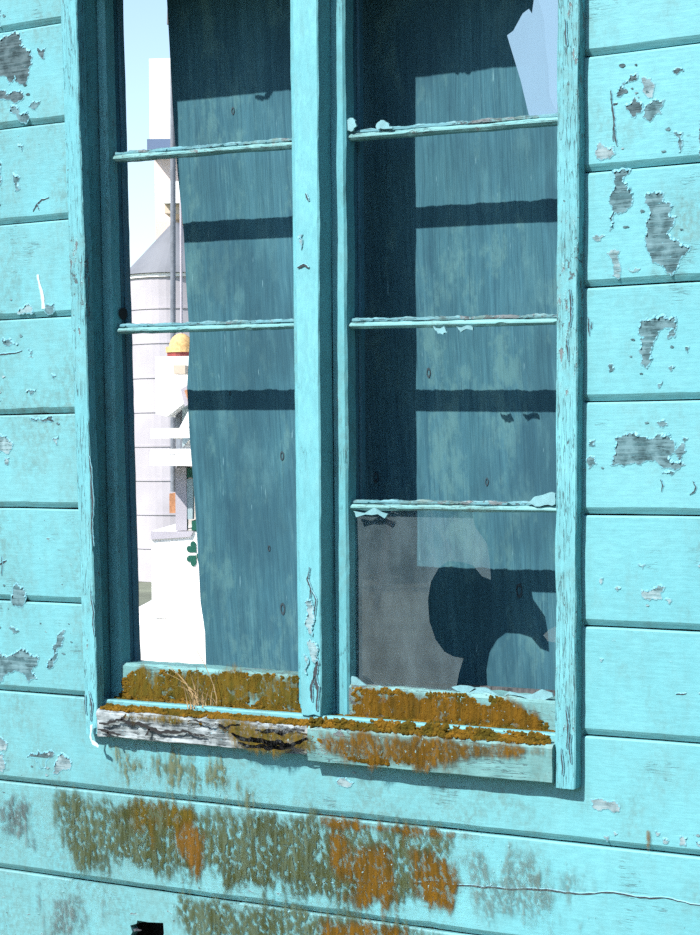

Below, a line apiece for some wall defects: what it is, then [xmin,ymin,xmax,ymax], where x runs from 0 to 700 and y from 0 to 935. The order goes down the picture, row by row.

peeling [0,9,46,124]
peeling [0,161,20,192]
peeling [594,141,624,161]
peeling [592,167,691,280]
peeling [629,313,678,374]
peeling [585,419,689,476]
peeling [0,623,72,684]
crack [321,880,700,906]